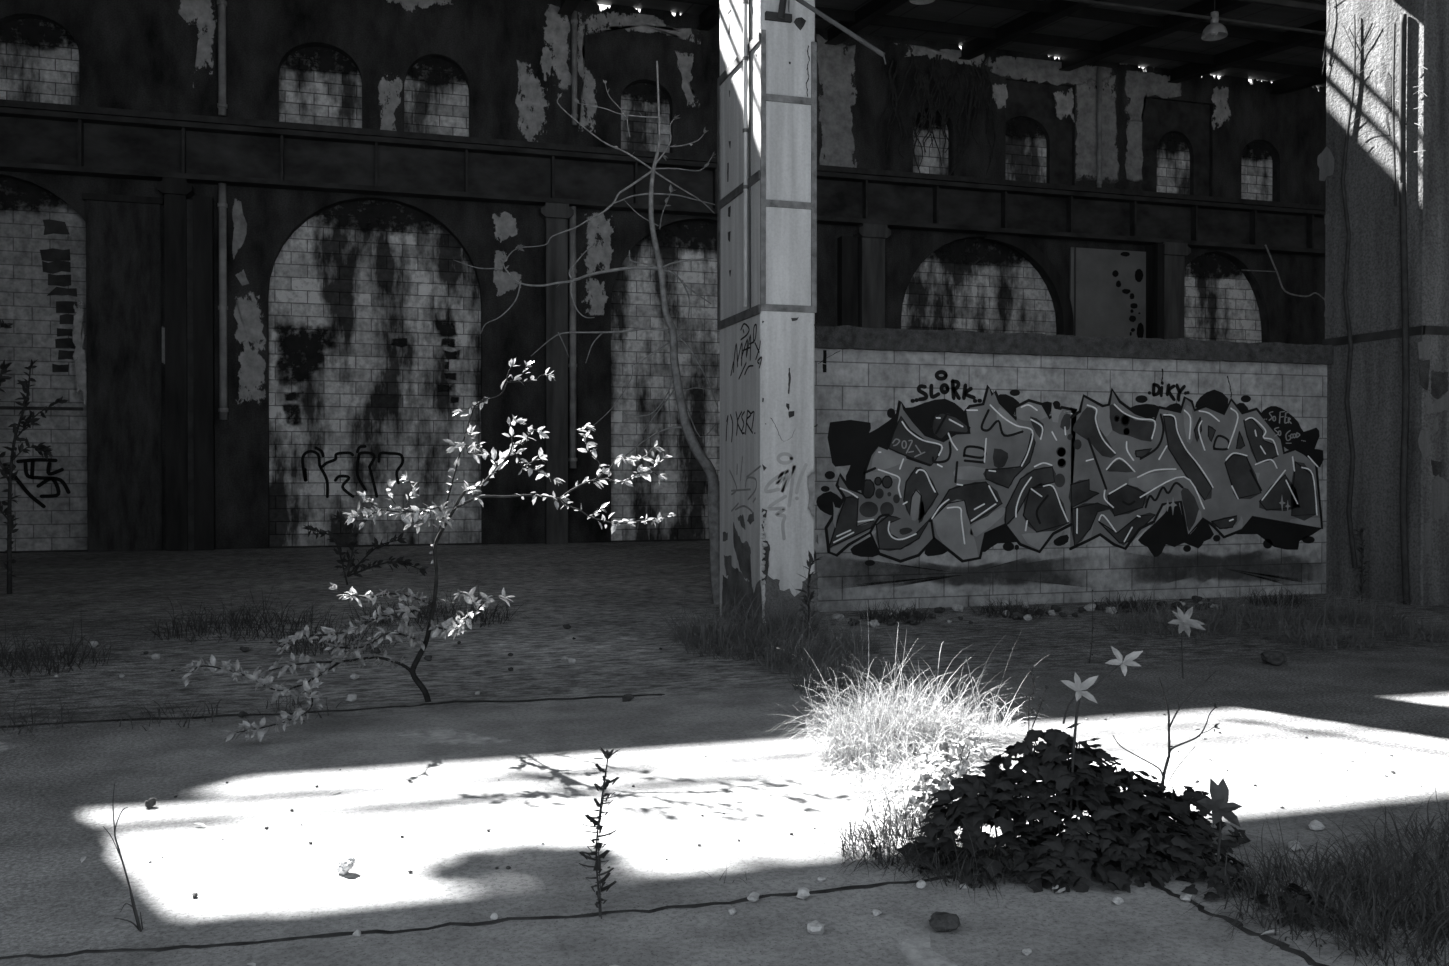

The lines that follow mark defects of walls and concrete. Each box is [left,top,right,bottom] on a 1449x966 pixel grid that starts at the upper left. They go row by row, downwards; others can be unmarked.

peeling [178,0,217,88]
peeling [515,4,701,142]
peeling [895,43,1182,181]
peeling [1211,86,1231,130]
peeling [492,211,521,296]
peeling [582,212,615,315]
peeling [72,300,87,406]